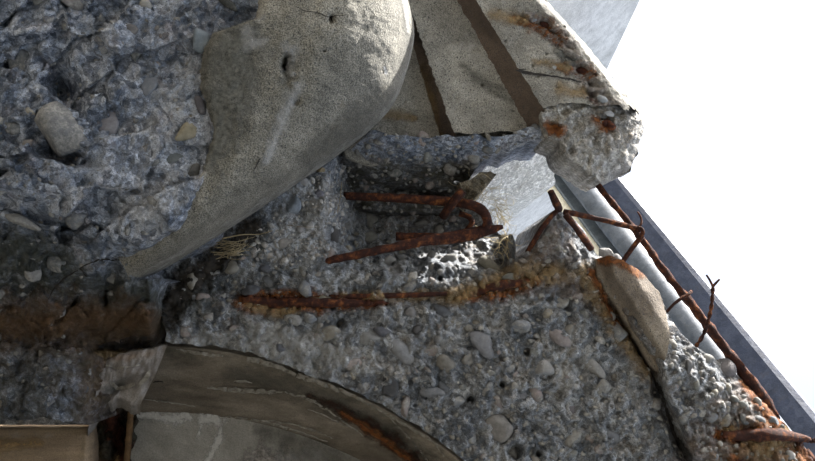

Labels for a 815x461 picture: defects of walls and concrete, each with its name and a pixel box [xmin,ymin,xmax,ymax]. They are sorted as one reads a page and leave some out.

rust [491,11,568,46]
rust [543,120,566,137]
spalling [325,192,503,265]
rust [234,289,387,317]
spalling [242,291,453,309]
rust [399,265,564,304]
spalling [476,278,531,296]
rust [578,255,654,375]
peeling [207,380,363,436]
peeling [246,357,443,450]
crack [648,366,693,461]
rust [714,380,813,461]